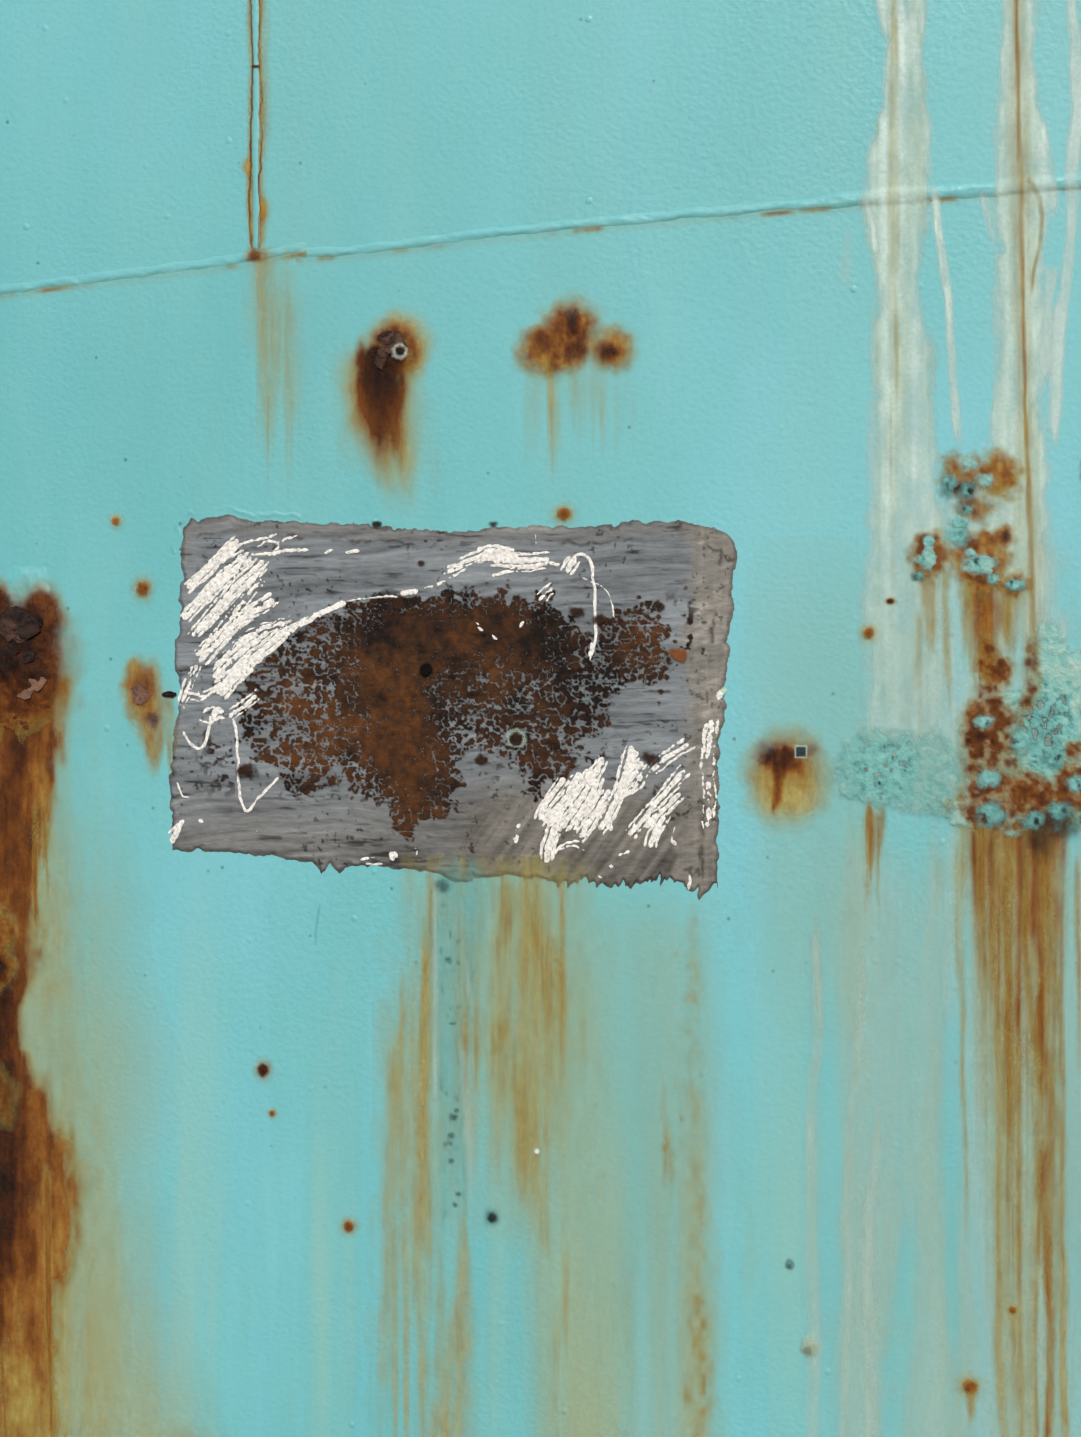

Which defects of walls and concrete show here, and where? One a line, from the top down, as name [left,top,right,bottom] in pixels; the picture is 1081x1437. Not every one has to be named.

rust [352,316,426,461]
rust [518,302,631,418]
leakage [865,0,981,761]
leakage [969,0,1081,657]
rust [908,450,1031,680]
rust [122,659,170,764]
rust [203,579,705,841]
rust [750,738,820,816]
rust [0,585,79,1437]
rust [415,960,428,1237]
rust [962,822,1080,1437]